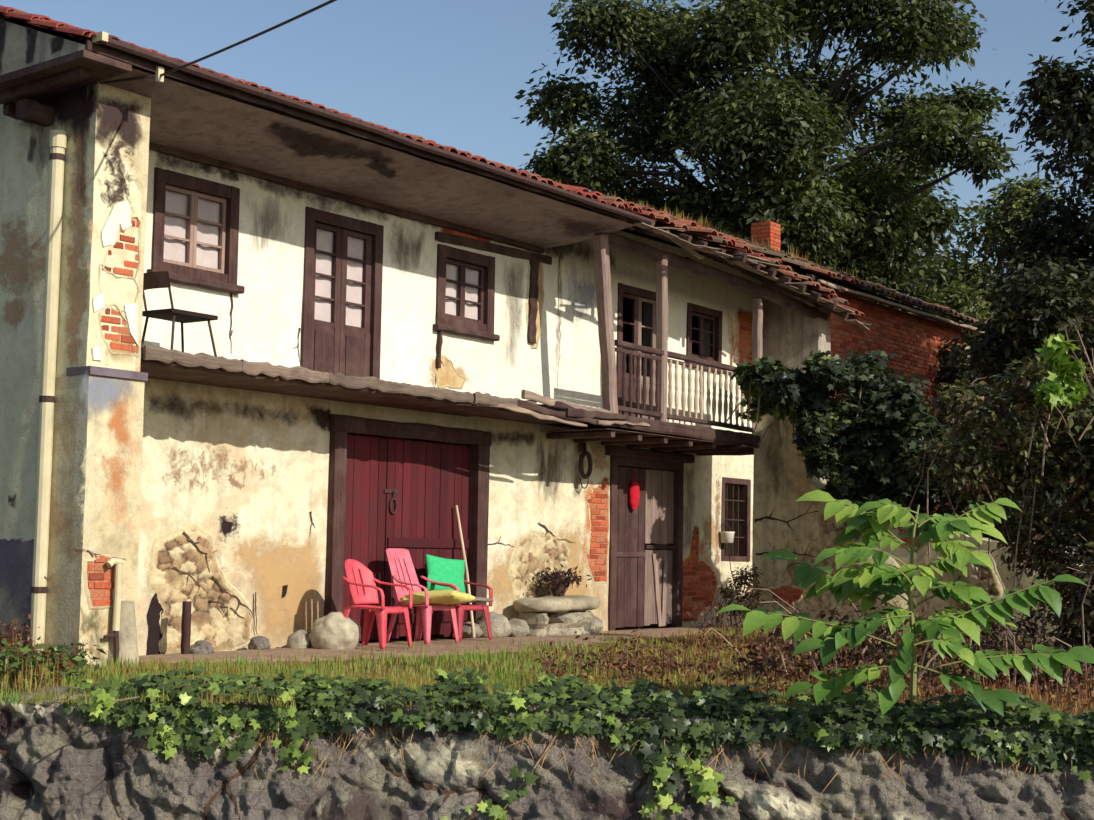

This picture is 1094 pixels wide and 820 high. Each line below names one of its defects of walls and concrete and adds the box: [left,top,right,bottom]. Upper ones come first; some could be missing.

damp [36,85,141,206]
damp [270,123,395,178]
flaking render [89,200,141,361]
flaking render [737,308,752,366]
peeling [435,354,466,389]
flaking render [559,476,610,595]
flaking render [682,481,720,623]
crack [754,508,831,560]
flaking render [83,554,115,610]
flaking render [768,583,807,604]